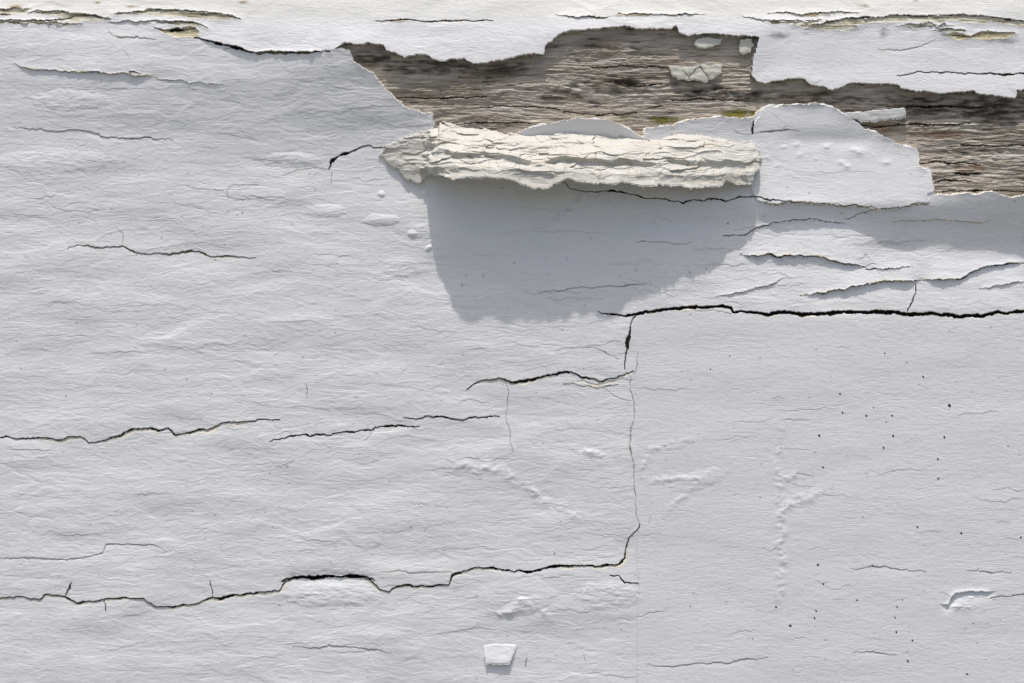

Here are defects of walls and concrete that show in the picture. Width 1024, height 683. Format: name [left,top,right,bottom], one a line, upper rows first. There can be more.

peeling [0,8,1024,236]
crack [282,145,382,184]
crack [68,227,252,259]
peeling [740,252,1024,296]
crack [0,283,1024,610]